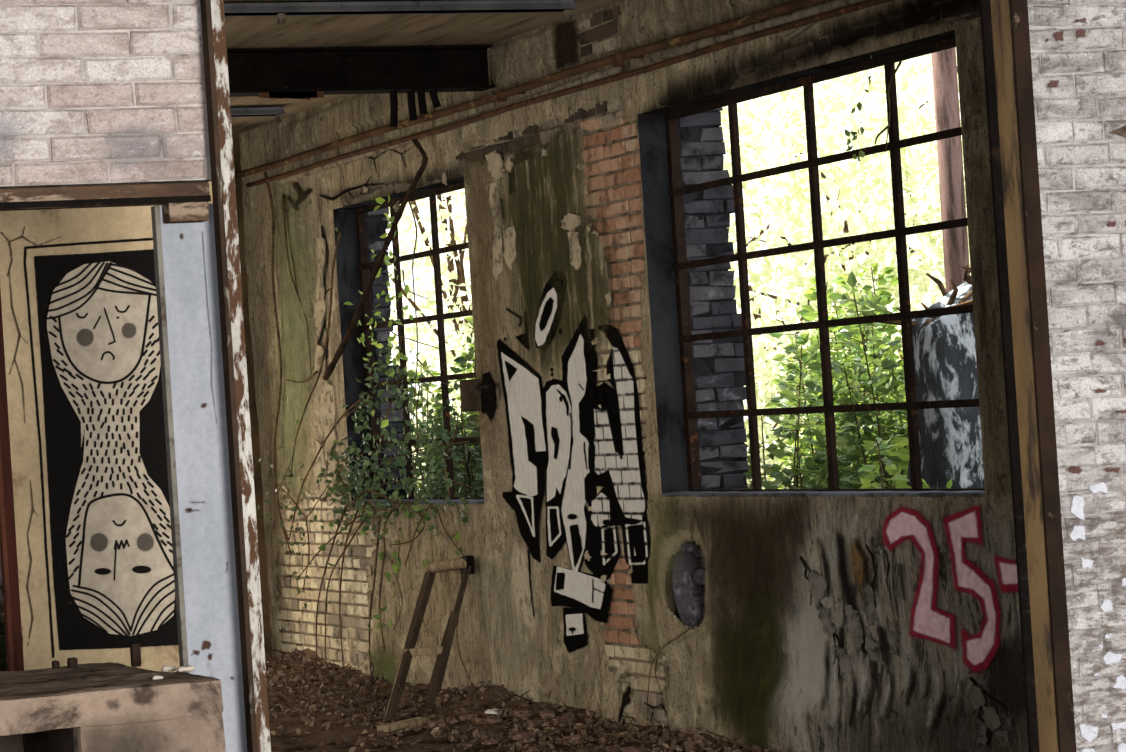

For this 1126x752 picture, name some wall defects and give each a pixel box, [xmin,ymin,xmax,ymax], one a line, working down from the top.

corrosion [554,21,578,69]
crack [1,226,61,422]
corrosion [200,0,258,752]
spalling [272,238,377,676]
spalling [455,96,652,551]
spalling [583,525,669,731]
spalling [672,541,706,630]
damp [672,500,929,752]
crack [800,557,824,607]
crack [833,632,843,679]
crack [865,545,892,608]
peeling [1070,468,1126,752]